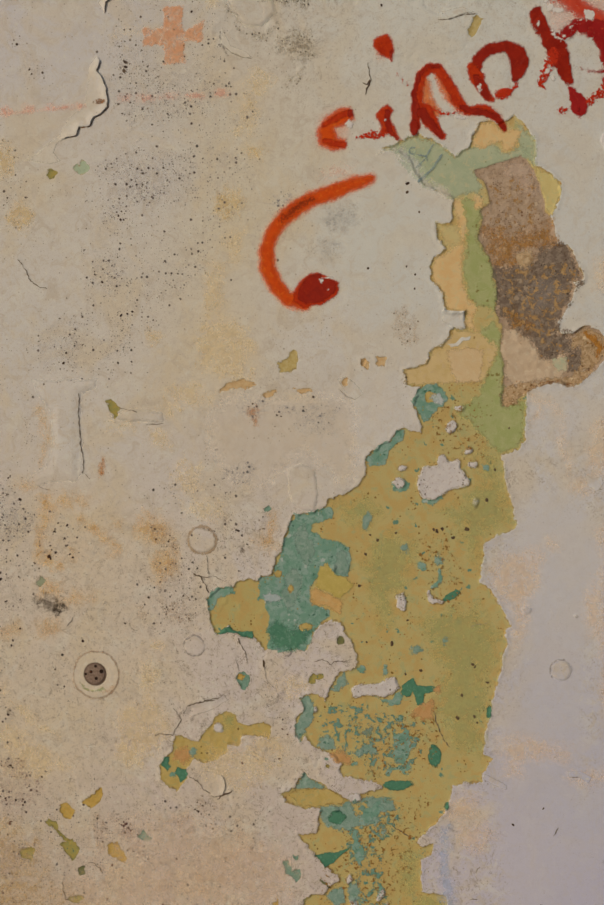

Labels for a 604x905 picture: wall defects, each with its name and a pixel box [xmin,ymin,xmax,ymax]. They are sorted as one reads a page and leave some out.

peeling [28,56,109,179]
mould [26,1,260,383]
crack [78,393,90,479]
peeling [207,115,604,905]
crack [155,697,220,736]
peeling [159,711,271,792]
peeling [45,788,103,876]
peeling [107,842,127,863]